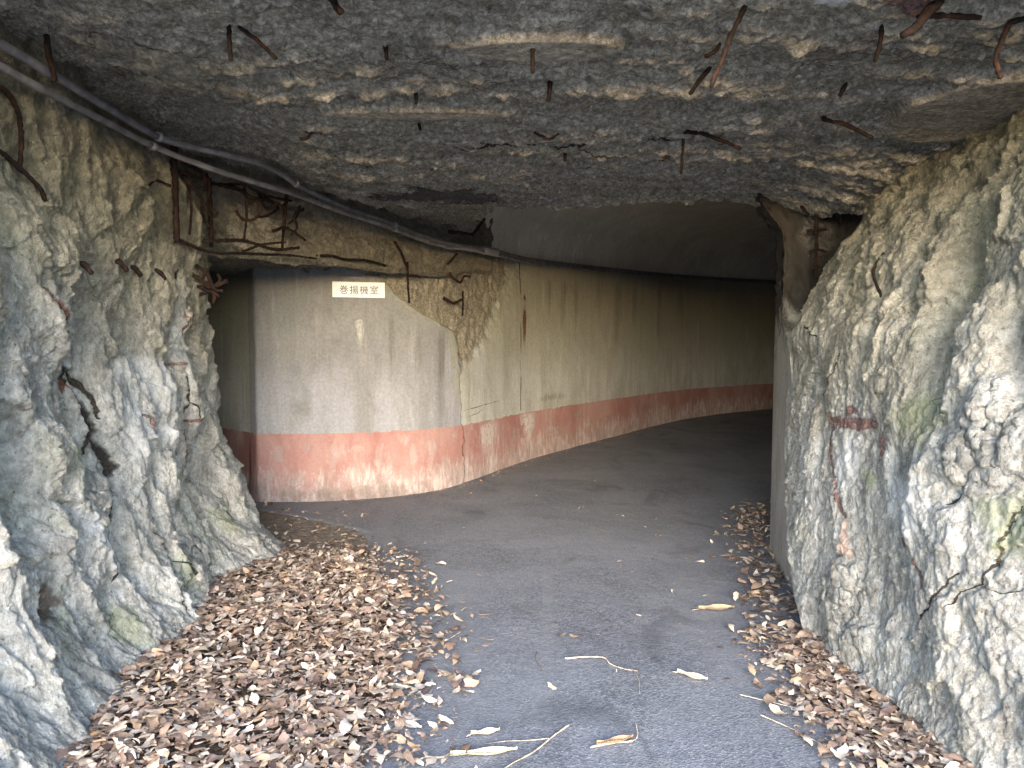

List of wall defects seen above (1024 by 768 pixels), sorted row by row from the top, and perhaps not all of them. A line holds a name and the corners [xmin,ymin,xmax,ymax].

corrosion [226,24,278,61]
corrosion [688,4,748,95]
corrosion [884,0,982,39]
corrosion [659,130,742,174]
spalling [368,186,501,205]
spalling [221,202,329,272]
spalling [377,256,505,361]
spalling [797,206,843,280]
corrosion [871,252,884,297]
crack [60,365,119,582]
corrosion [827,405,885,554]
crack [919,506,1023,619]